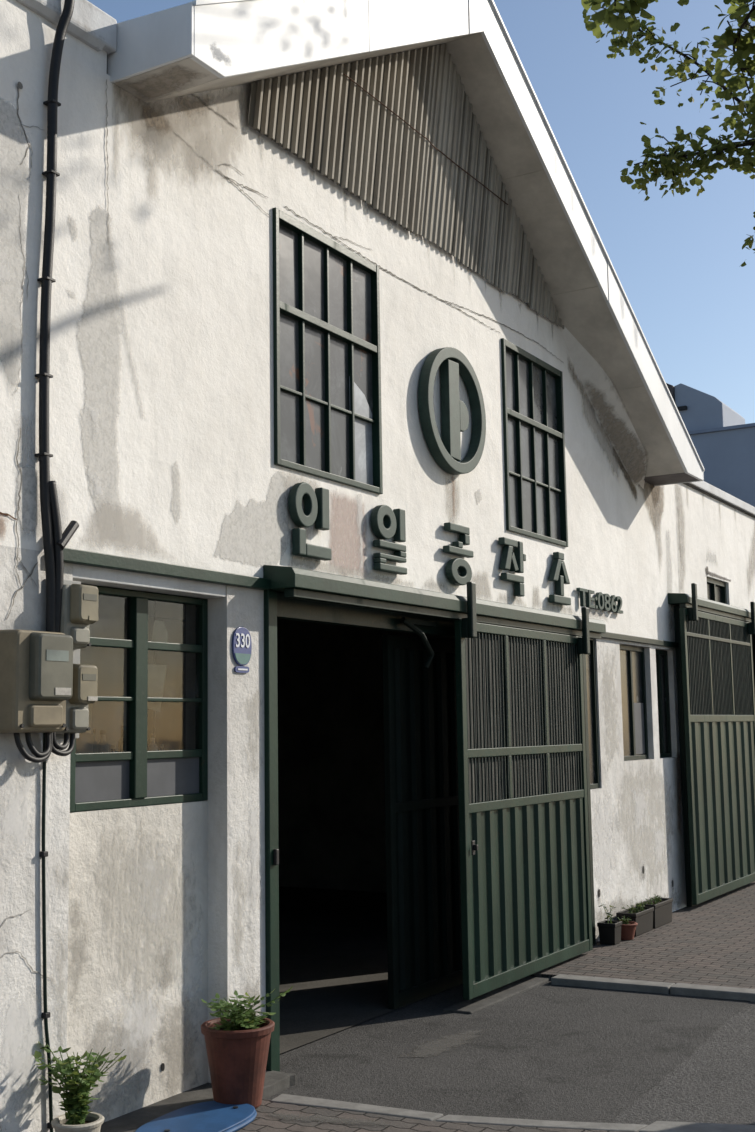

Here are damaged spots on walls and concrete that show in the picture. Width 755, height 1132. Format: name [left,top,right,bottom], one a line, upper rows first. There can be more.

leakage [119,67,243,188]
crack [191,94,237,129]
peeling [0,98,30,385]
crack [174,131,562,362]
crack [6,428,38,620]
peeling [69,206,158,551]
peeling [171,463,181,521]
peeling [214,471,315,567]
leakage [569,364,664,554]
crack [0,910,53,980]